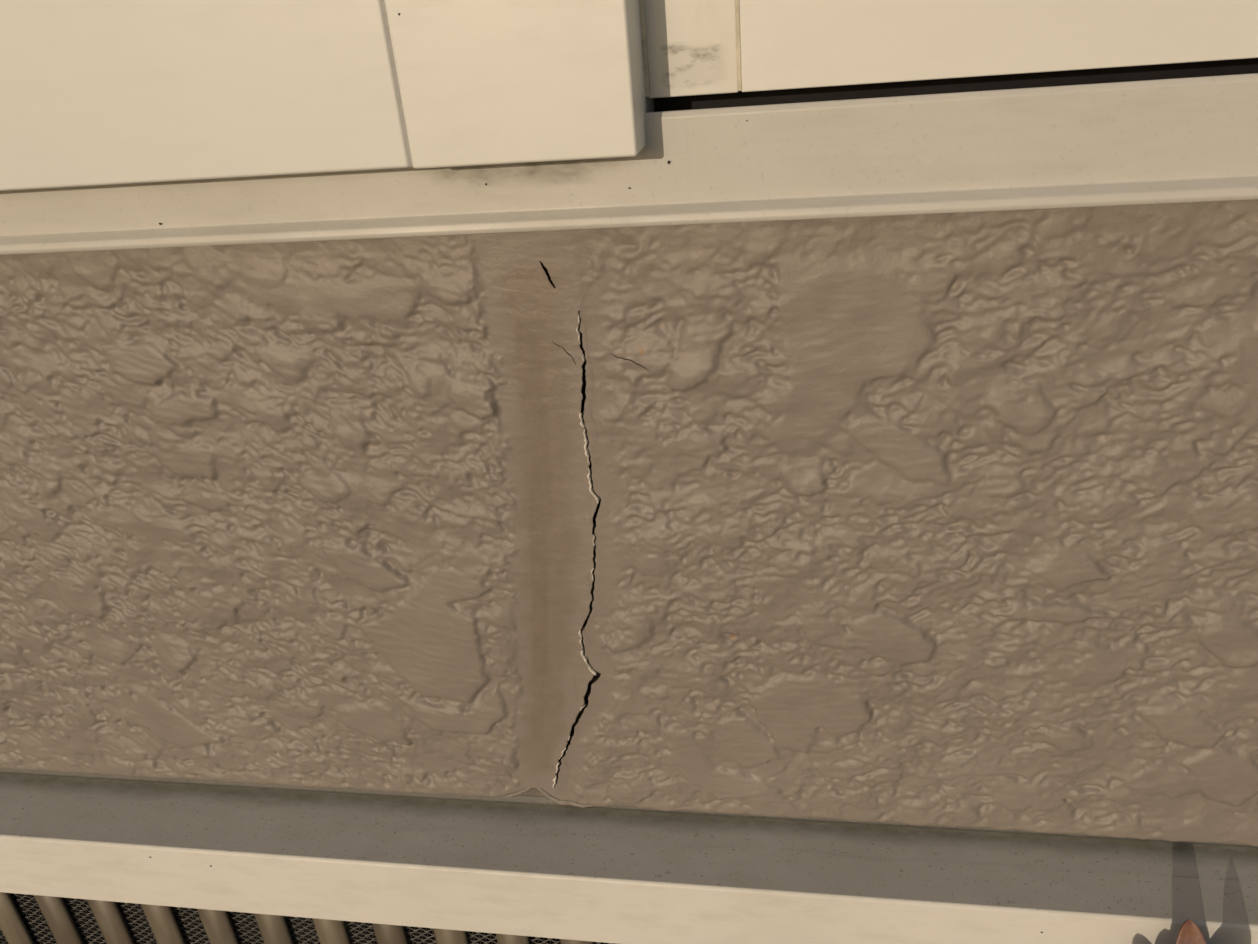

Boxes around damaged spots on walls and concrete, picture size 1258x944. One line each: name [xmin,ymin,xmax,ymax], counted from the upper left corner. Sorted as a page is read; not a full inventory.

crack [539,261,555,288]
crack [553,311,649,788]